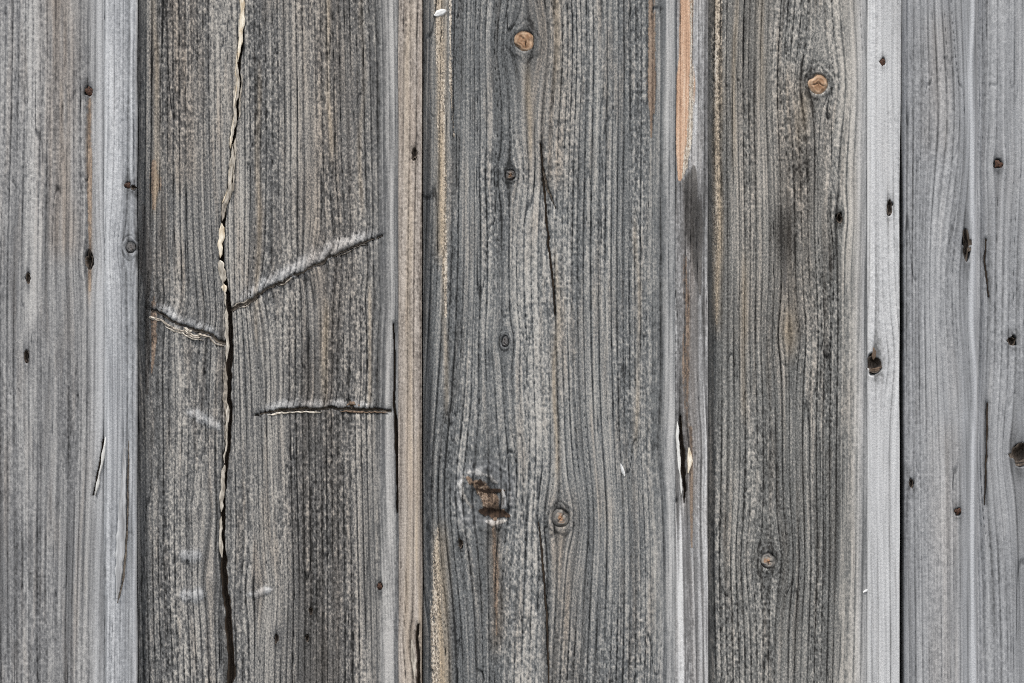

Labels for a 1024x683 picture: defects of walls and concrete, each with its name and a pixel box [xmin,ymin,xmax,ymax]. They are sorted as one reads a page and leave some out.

crack [540,144,556,314]
crack [149,0,398,683]
crack [676,417,693,502]